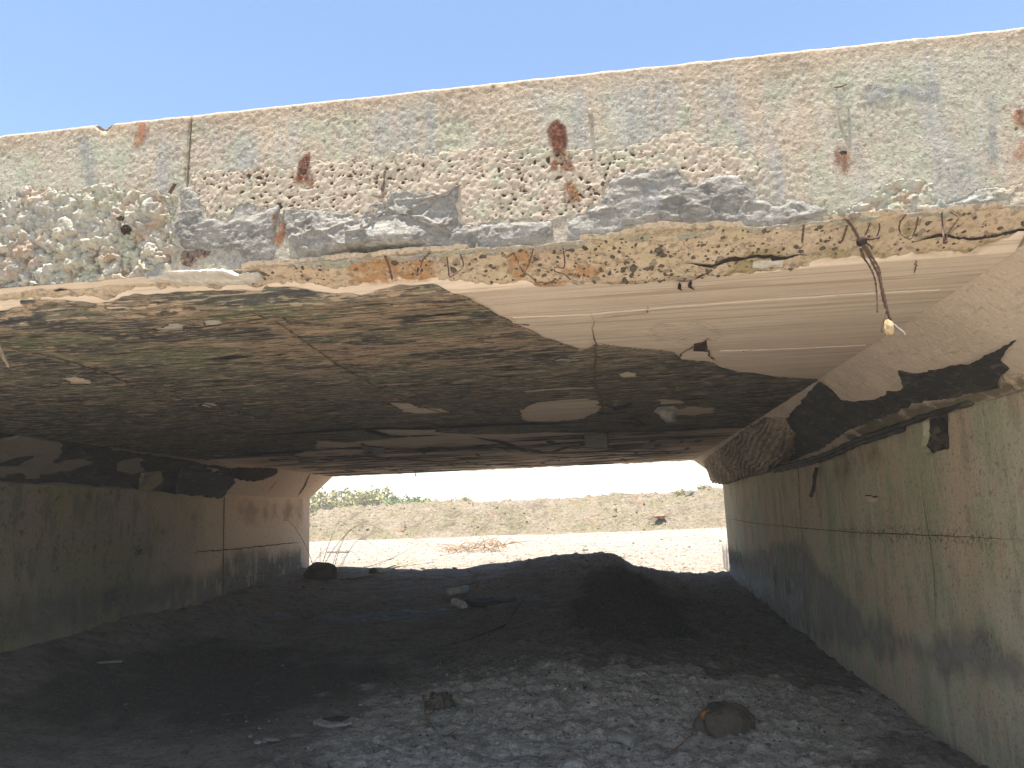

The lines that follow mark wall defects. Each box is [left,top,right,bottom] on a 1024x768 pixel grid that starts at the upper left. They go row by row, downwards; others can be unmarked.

crack [185,116,193,185]
rust [294,154,313,186]
rust [547,120,579,203]
spalling [0,182,210,309]
rust [272,215,285,244]
spalling [236,178,1024,298]
rust [350,258,434,283]
spalling [678,339,715,361]
spalling [225,459,279,482]
peeling [311,429,492,472]
peeling [483,387,602,464]
spalling [931,431,949,452]